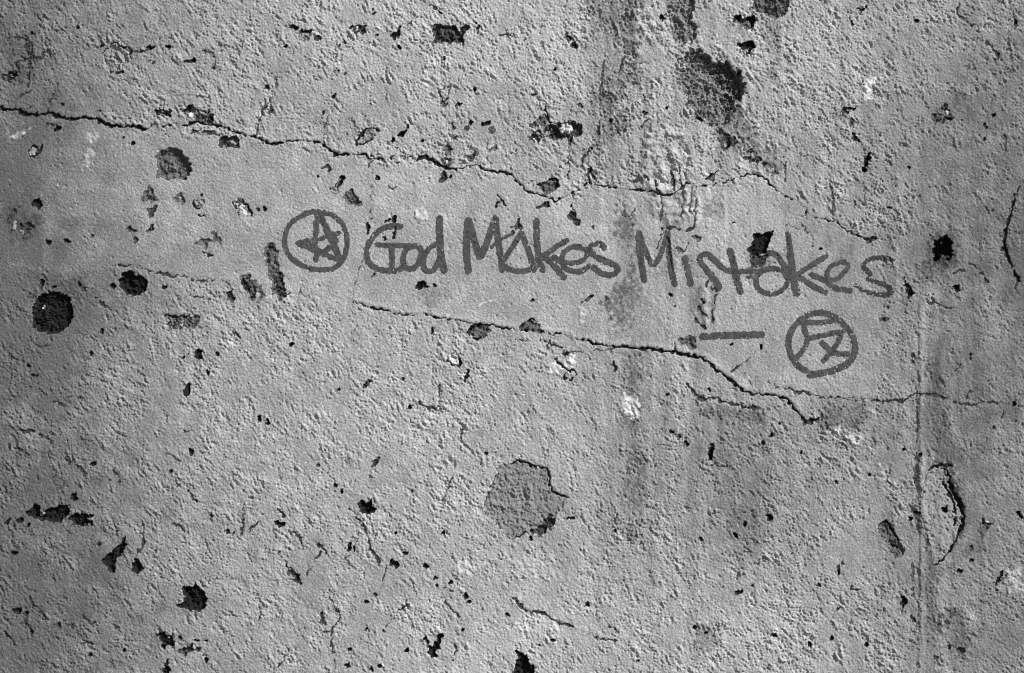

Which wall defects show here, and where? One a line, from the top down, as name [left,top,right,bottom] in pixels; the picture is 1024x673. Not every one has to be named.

spalling [423,21,480,60]
spalling [659,0,747,150]
spalling [126,133,205,246]
crack [0,33,867,270]
spalling [529,107,583,145]
spalling [748,230,774,267]
spalling [32,279,74,334]
crack [352,260,1021,492]
spalling [484,459,575,541]
spalling [176,584,208,612]
crack [909,562,917,644]
spalling [514,650,535,673]